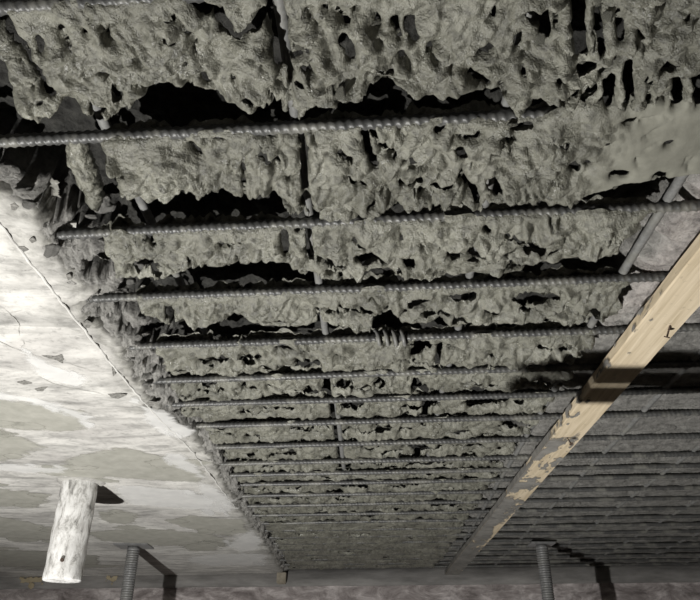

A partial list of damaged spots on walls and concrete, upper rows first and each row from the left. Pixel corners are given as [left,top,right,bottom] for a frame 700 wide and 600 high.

spalling [0,15,101,135]
spalling [109,72,290,127]
spalling [192,0,282,64]
spalling [302,67,503,120]
spalling [569,0,634,103]
spalling [361,129,397,165]
spalling [582,171,674,202]
spalling [337,304,449,330]
spalling [0,143,344,572]
spalling [292,351,364,467]
spalling [407,340,443,364]
spalling [435,211,700,565]